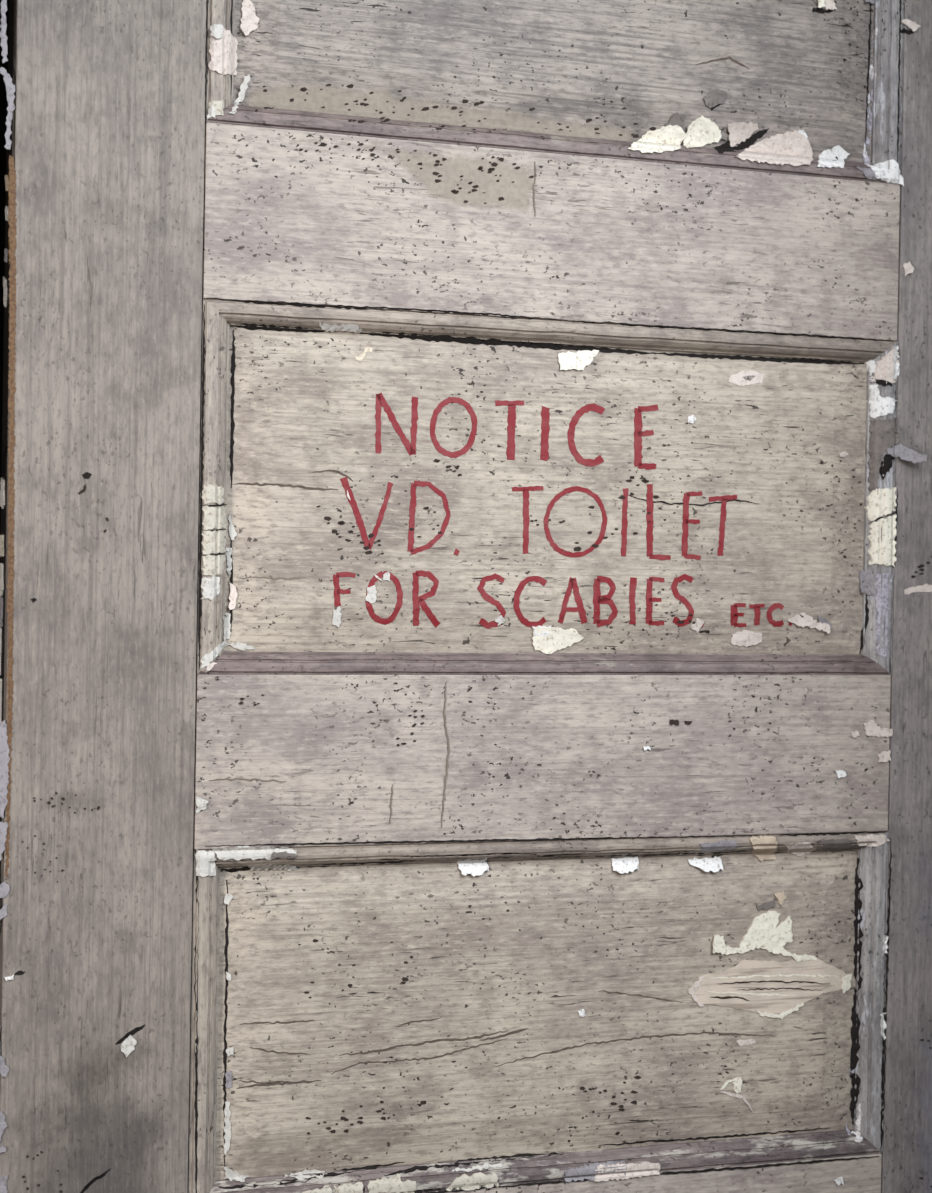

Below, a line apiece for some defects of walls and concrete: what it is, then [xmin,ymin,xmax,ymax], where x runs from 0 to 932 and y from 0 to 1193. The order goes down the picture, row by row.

peeling [297,142,534,206]
peeling [206,0,921,186]
peeling [859,346,932,657]
peeling [531,625,584,654]
peeling [195,846,563,1193]
peeling [688,891,852,1019]